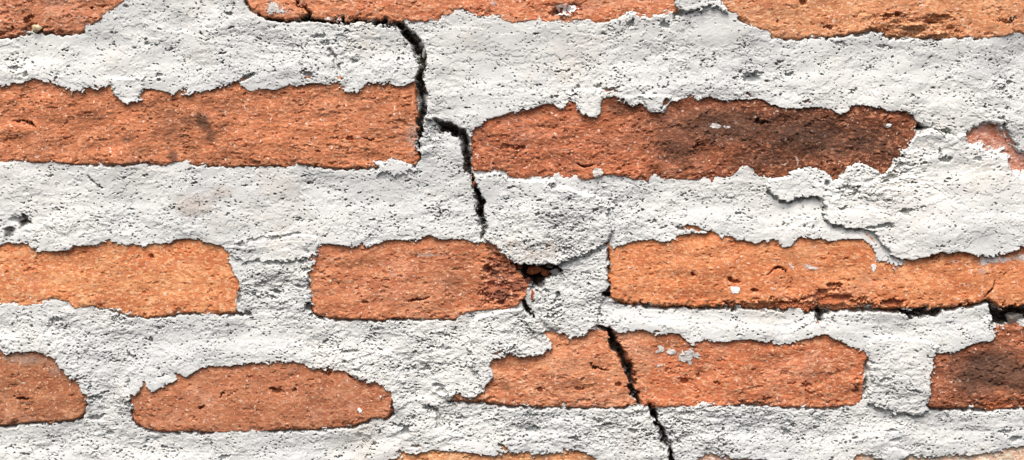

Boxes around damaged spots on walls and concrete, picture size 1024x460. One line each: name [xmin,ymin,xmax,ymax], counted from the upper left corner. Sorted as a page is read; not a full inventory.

spalling [540,2,582,19]
spalling [0,22,69,39]
spalling [876,7,964,41]
spalling [472,245,563,311]
spalling [718,283,907,313]
crack [592,328,675,460]
spalling [740,398,772,406]
spalling [850,379,864,399]
spalling [960,390,1024,411]